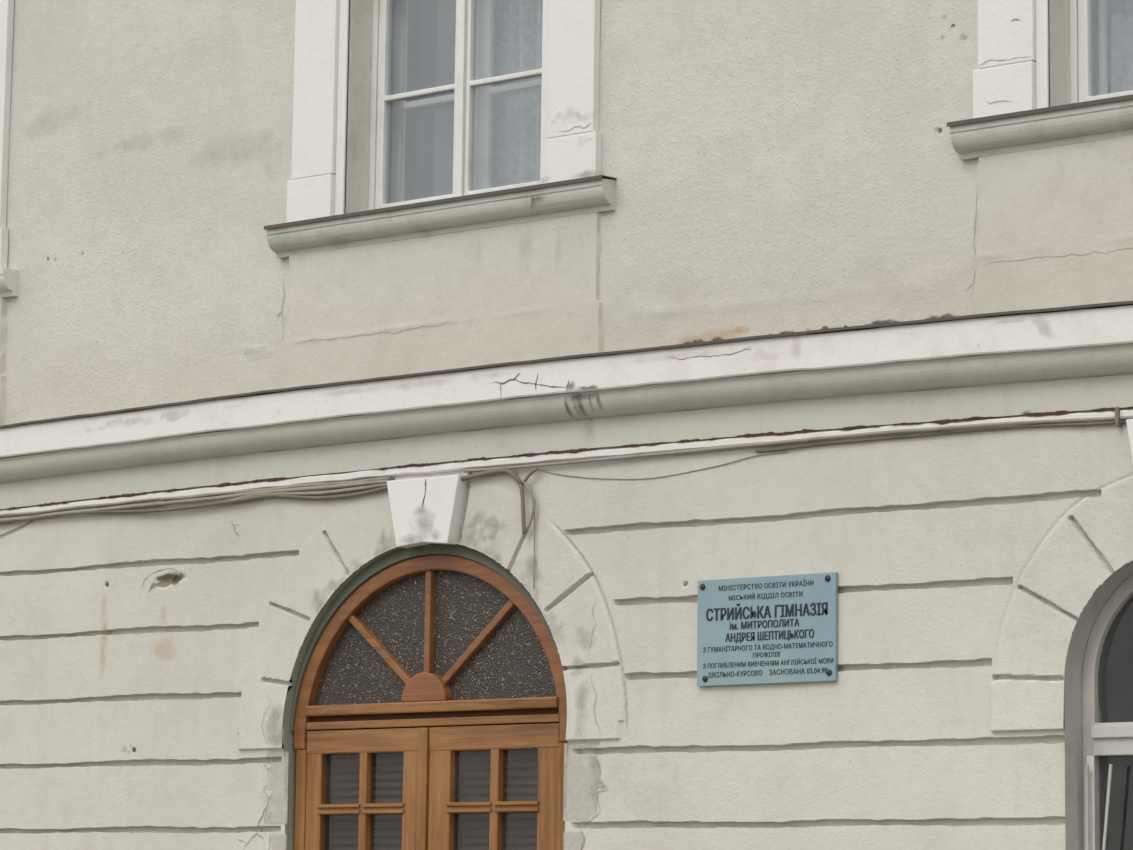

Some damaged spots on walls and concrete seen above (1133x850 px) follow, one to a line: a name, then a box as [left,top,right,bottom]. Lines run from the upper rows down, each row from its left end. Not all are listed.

crack [967,191,1133,296]
crack [277,278,474,345]
crack [490,374,572,398]
crack [1020,406,1133,417]
crack [372,416,992,507]
spalling [142,568,183,593]